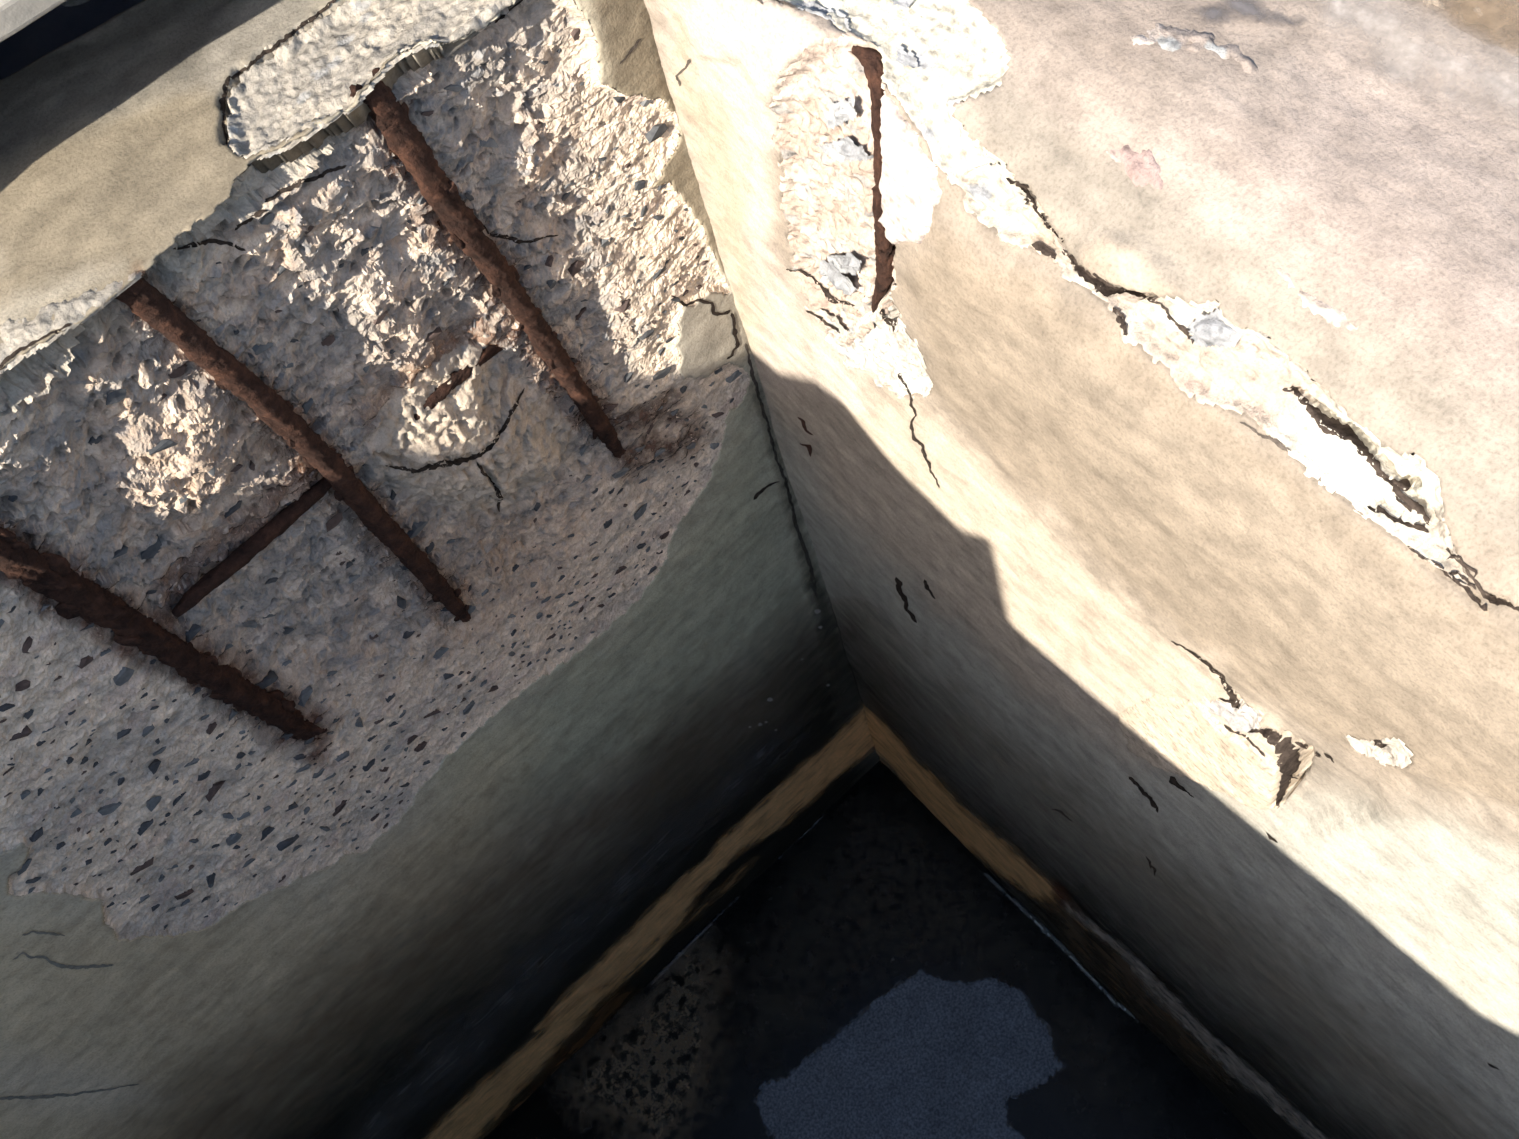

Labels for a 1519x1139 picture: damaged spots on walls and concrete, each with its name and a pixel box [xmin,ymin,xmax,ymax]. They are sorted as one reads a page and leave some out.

rust [432,210,454,247]
spalling [769,0,1470,588]
spalling [0,0,750,940]
crack [1171,641,1240,709]
flaking render [1345,735,1413,769]